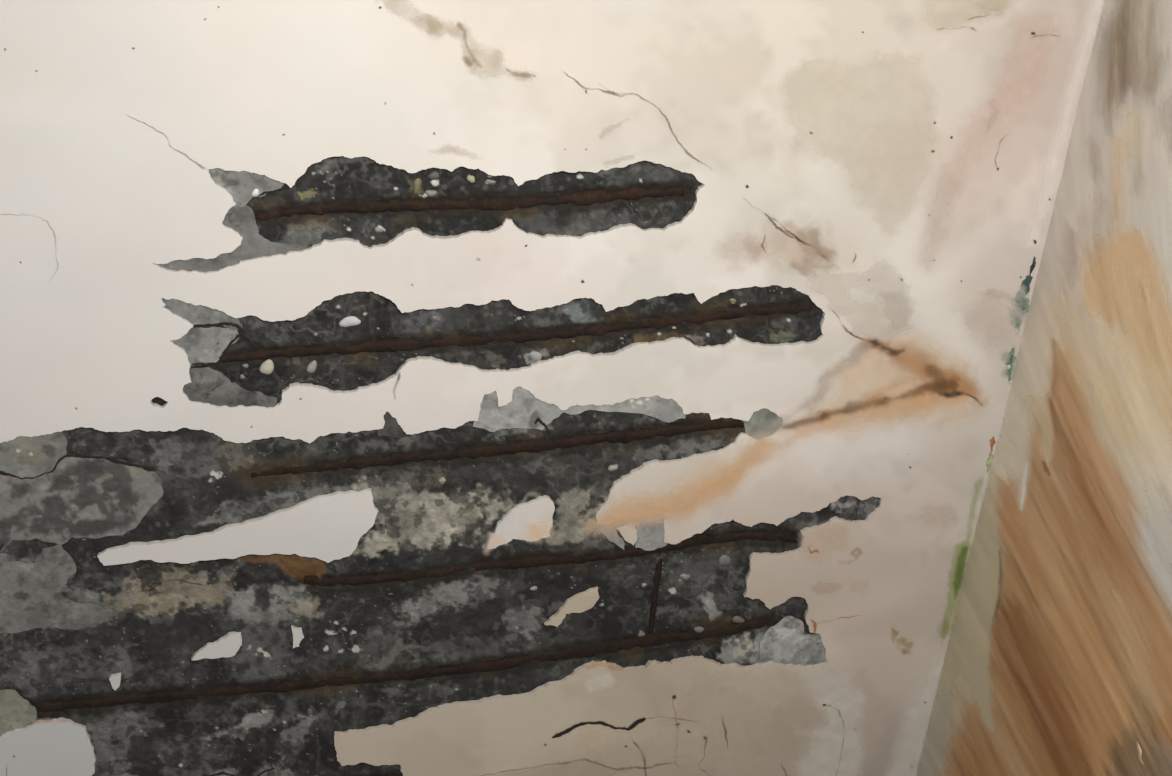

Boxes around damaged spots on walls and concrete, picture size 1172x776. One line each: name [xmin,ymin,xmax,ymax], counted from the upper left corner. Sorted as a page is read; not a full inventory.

crack [660,110,699,161]
spalling [158,156,703,272]
crack [762,219,802,248]
spalling [162,285,823,408]
rust [783,338,976,435]
rust [606,441,773,526]
spalling [0,386,880,776]
crack [552,718,728,776]